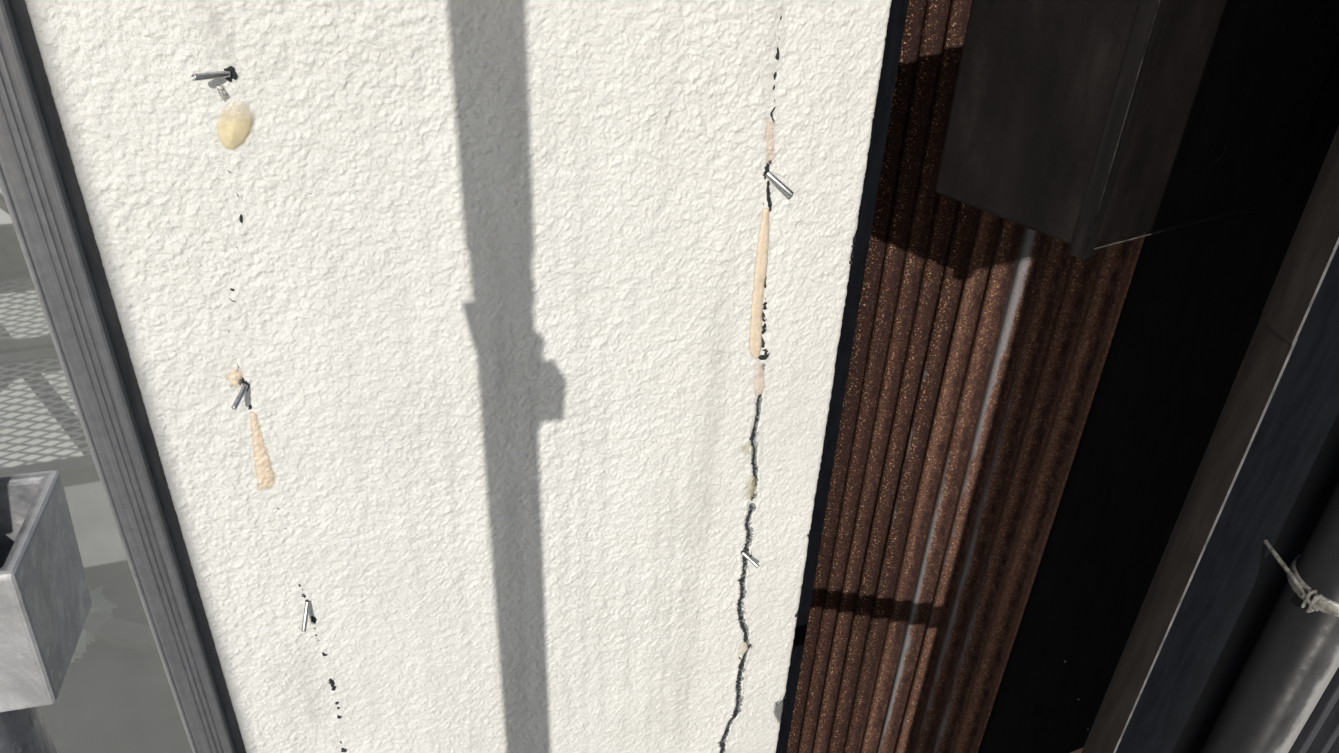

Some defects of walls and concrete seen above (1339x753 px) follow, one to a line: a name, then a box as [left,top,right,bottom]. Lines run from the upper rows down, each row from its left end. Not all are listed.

crack [770,16,782,123]
crack [763,160,772,212]
crack [717,254,770,753]